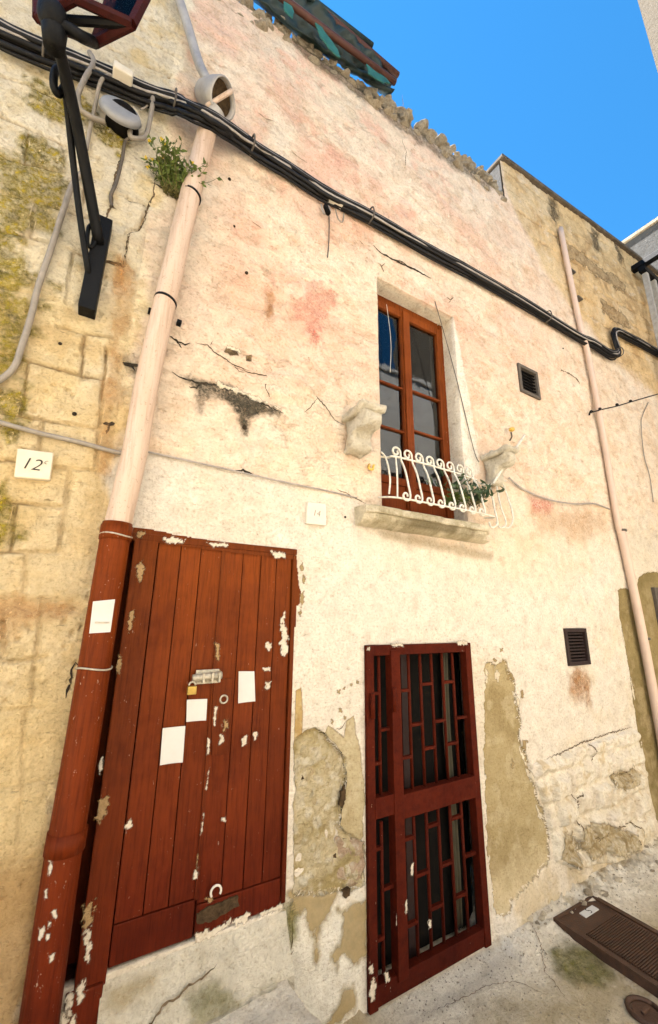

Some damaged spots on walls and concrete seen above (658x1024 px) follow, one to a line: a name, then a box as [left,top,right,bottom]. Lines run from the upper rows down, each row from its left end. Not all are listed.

crack [106,160,162,267]
crack [170,336,338,422]
flaking render [325,708,366,899]
flaking render [483,648,642,917]
crack [556,727,634,782]
crack [149,964,217,1024]